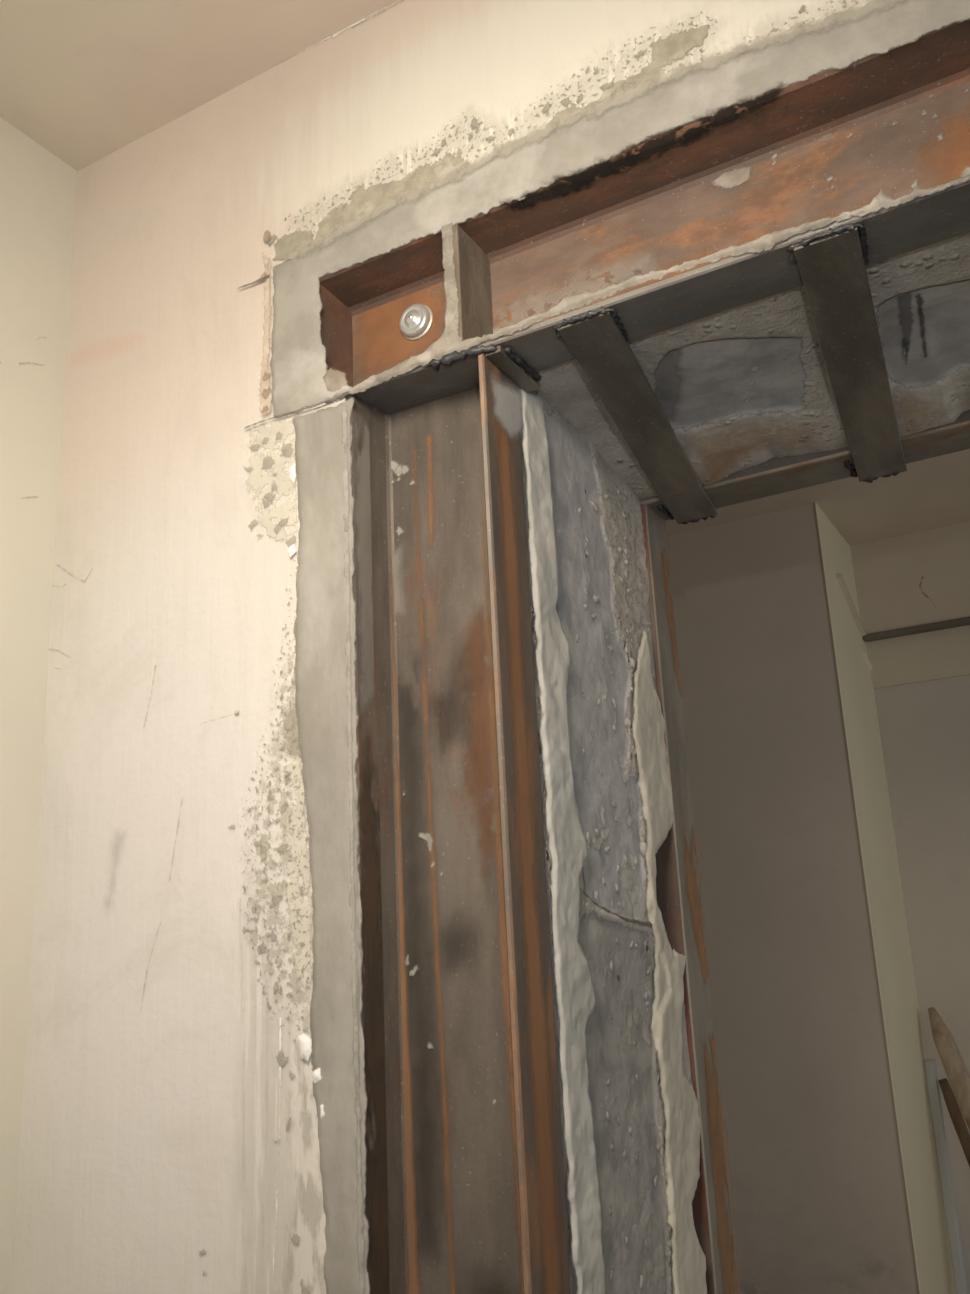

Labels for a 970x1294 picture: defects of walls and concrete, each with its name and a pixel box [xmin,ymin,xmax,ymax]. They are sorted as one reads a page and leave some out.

rust [392,624,419,1294]
rust [427,763,441,1001]
rust [470,624,524,1294]
rust [499,429,560,1294]
flaking render [229,0,904,1083]
spalling [544,409,672,1294]
rust [685,833,707,982]
rust [704,1037,739,1294]
spalling [876,280,970,389]
rust [947,124,970,182]